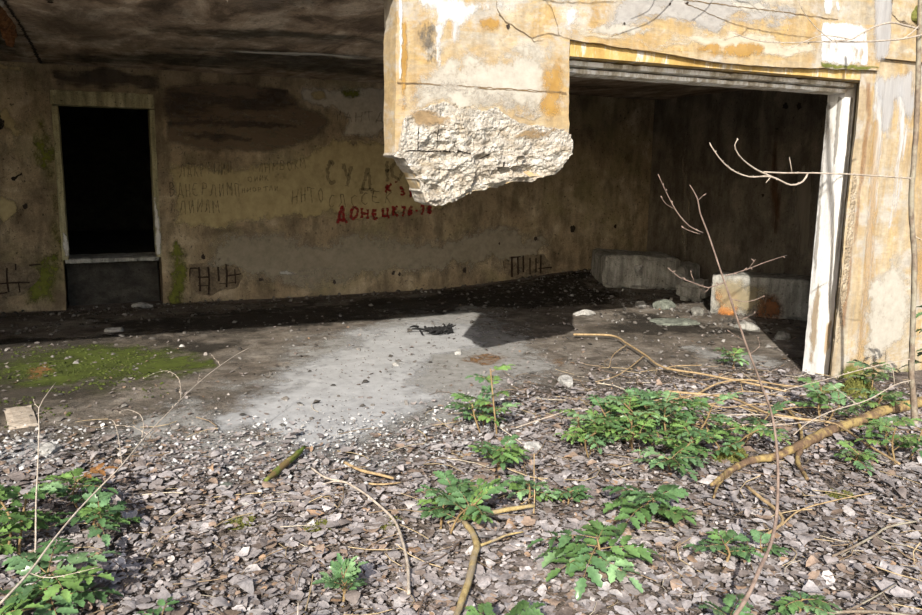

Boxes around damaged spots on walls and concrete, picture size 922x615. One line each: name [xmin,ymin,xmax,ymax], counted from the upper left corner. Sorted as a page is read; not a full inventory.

crack [2,0,43,64]
damp [399,0,407,92]
damp [421,0,502,66]
crack [496,0,617,42]
peeling [576,0,868,66]
crack [685,0,838,40]
peeling [171,44,573,228]
damp [208,226,549,289]
damp [0,268,619,416]